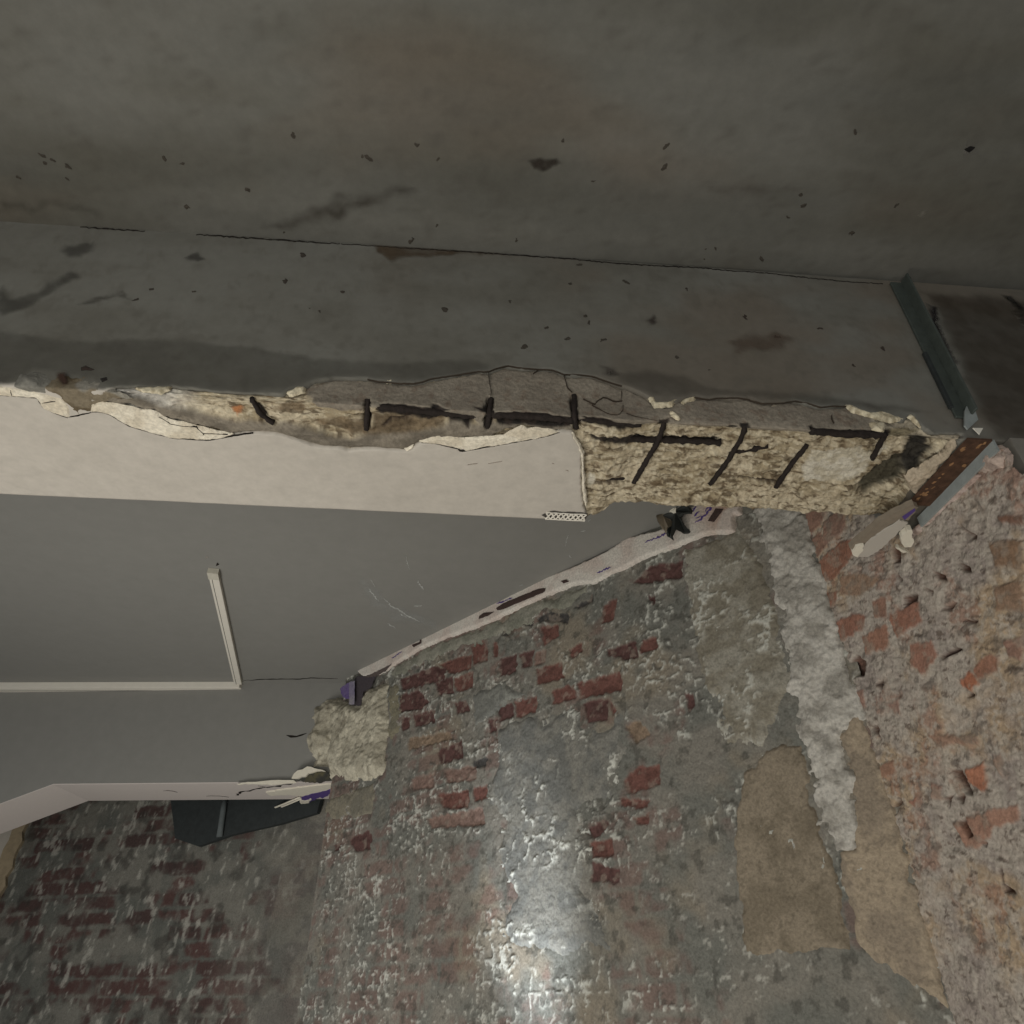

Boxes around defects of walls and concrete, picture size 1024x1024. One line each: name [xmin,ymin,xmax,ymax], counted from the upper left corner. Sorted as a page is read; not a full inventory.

crack [83,225,145,233]
crack [196,234,883,284]
crack [367,365,656,421]
spalling [0,366,960,557]
crack [244,675,336,683]
spalling [238,684,389,804]
flaking render [734,744,850,956]